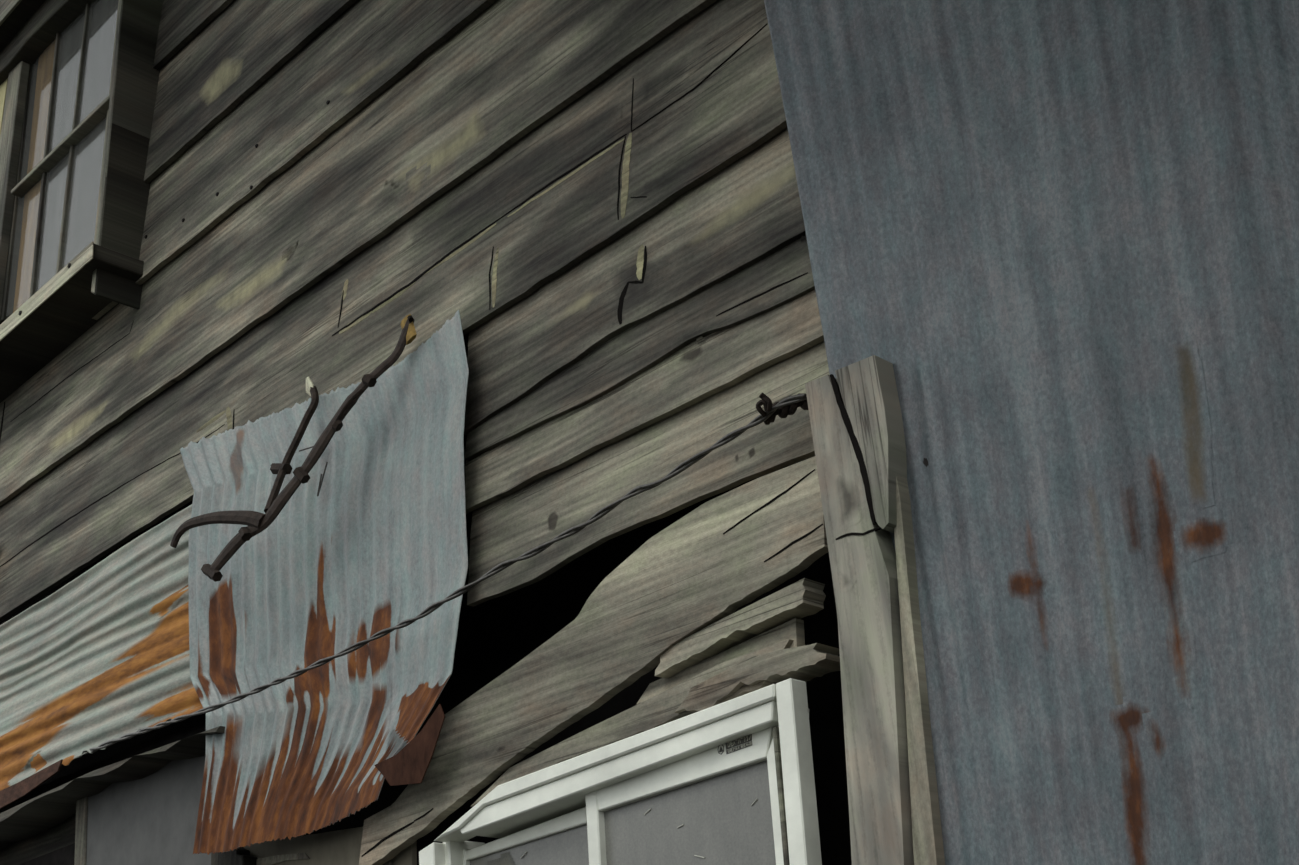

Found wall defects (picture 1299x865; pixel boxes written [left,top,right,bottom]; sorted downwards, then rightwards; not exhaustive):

crack [332,24,767,336]
crack [723,469,815,534]
crack [764,374,881,562]
rust [1004,514,1055,657]
rust [1116,335,1234,710]
rust [0,509,452,855]
rust [1106,693,1173,865]